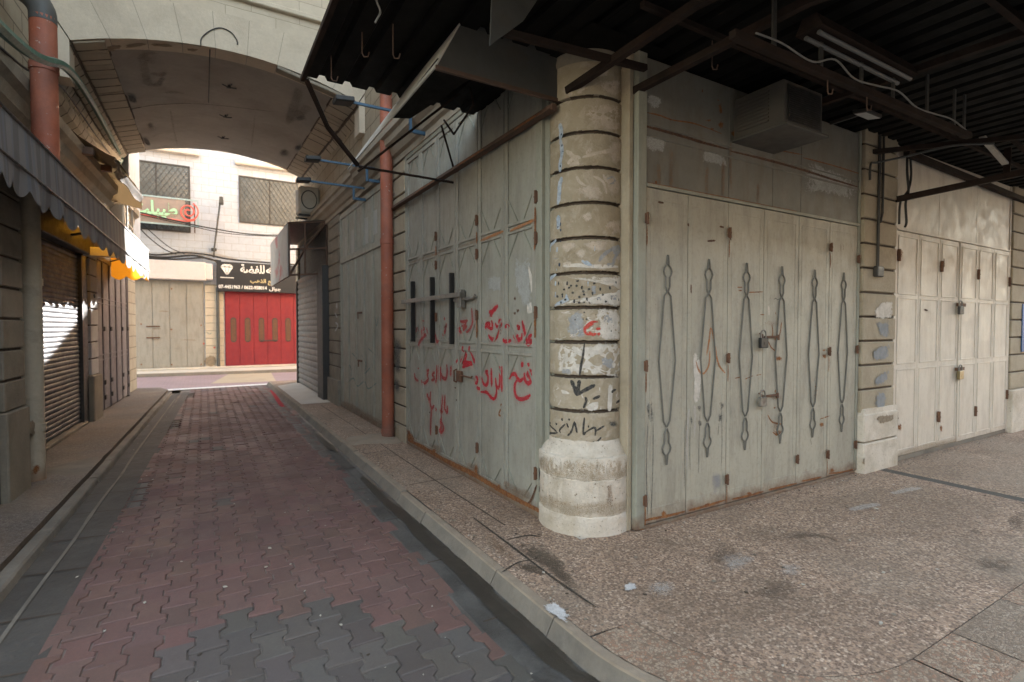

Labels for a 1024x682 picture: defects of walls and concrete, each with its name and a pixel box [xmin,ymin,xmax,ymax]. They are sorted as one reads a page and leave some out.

peeling [553,220,621,411]
peeling [874,302,893,319]
corrosion [407,431,539,513]
corrosion [640,449,853,530]